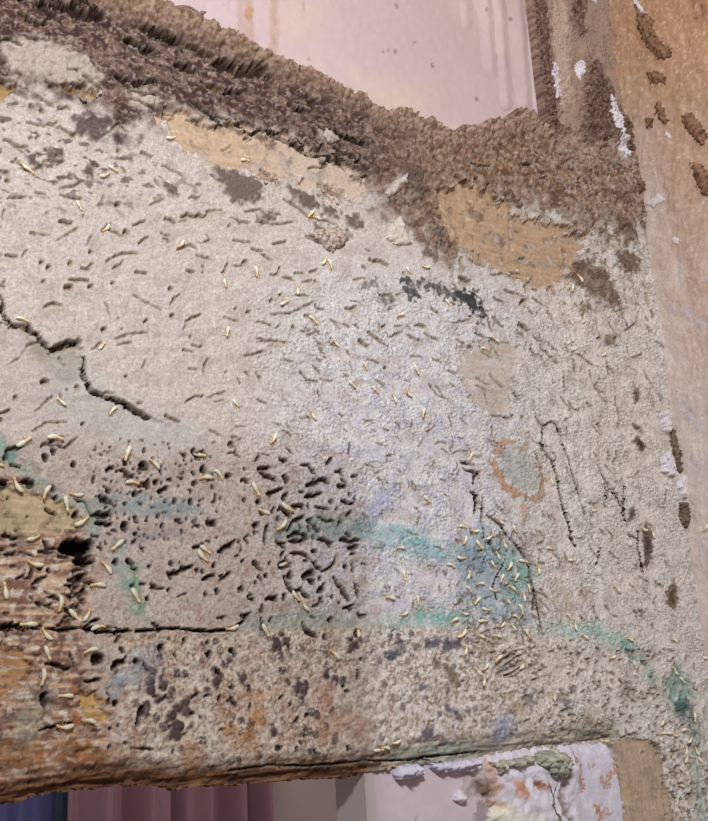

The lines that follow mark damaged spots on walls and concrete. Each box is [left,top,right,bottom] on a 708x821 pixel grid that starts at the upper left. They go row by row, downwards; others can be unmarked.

peeling [153,102,369,206]
peeling [433,176,588,291]
crack [0,301,150,420]
crack [539,422,578,548]
crack [0,613,248,634]
crack [230,750,485,771]
peeling [607,736,673,821]